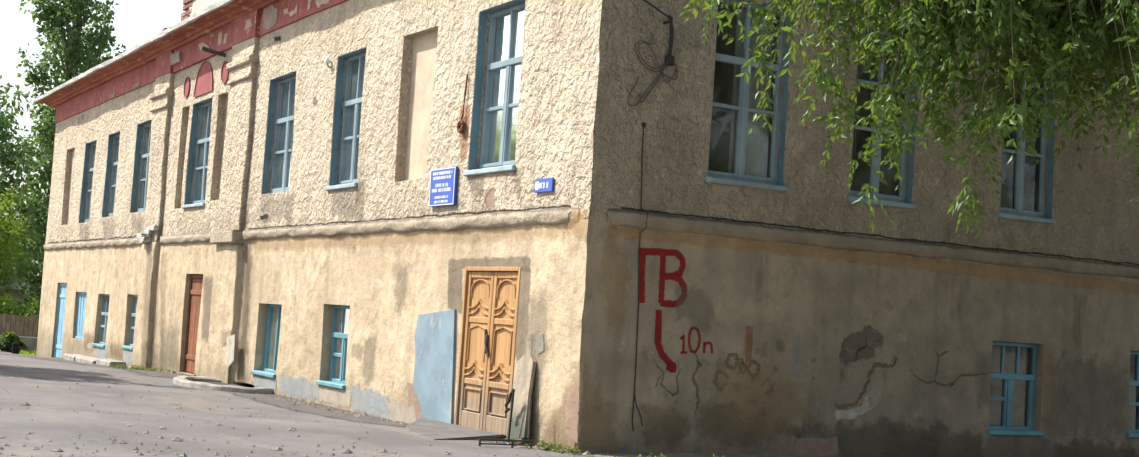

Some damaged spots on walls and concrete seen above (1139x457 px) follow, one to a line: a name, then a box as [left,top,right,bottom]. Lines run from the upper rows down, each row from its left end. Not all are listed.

spalling [181,0,193,21]
peeling [245,0,329,41]
peeling [198,31,227,51]
flaking render [841,326,881,364]